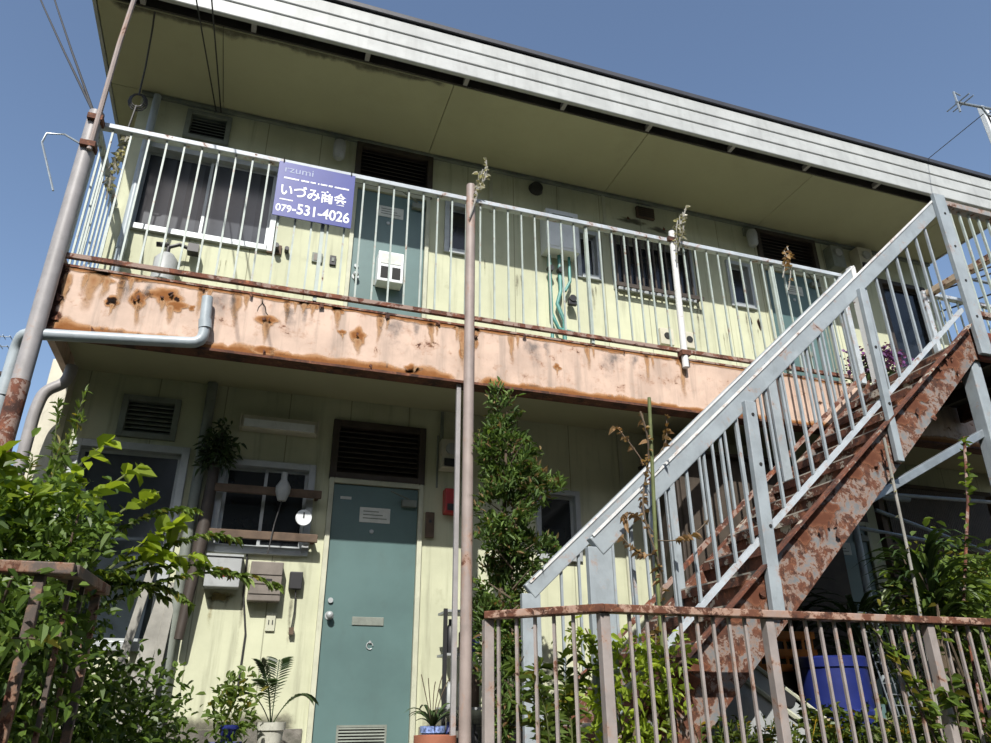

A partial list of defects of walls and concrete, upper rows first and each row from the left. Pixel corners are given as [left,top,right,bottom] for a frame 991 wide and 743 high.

corrosion [47,266,745,390]
corrosion [932,350,964,379]
corrosion [479,377,704,411]
corrosion [757,415,830,427]
corrosion [895,392,937,426]
corrosion [919,435,980,447]
corrosion [847,443,888,480]
corrosion [793,501,841,546]
corrosion [730,575,768,624]